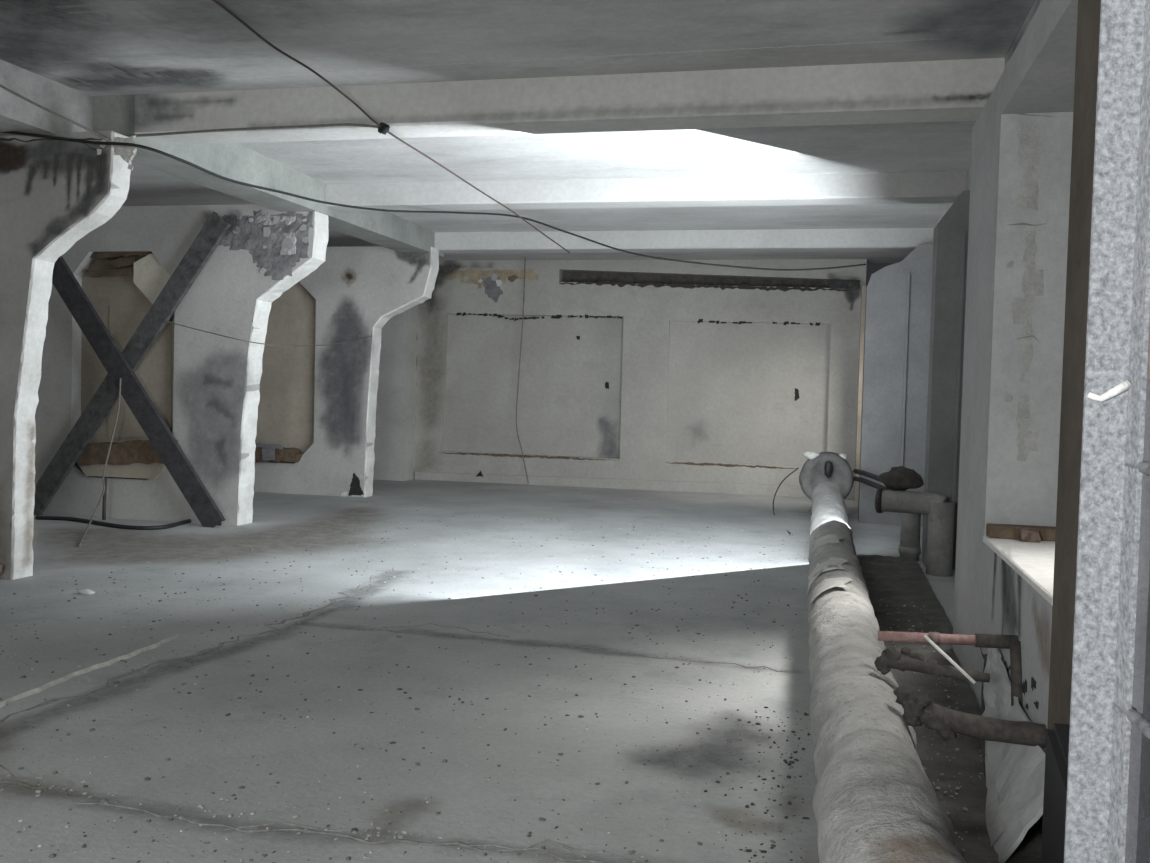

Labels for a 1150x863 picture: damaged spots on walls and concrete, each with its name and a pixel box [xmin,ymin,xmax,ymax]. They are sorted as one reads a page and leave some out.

water stain [23,138,107,255]
water stain [322,303,367,443]
crack [0,568,809,722]
crack [0,764,629,863]